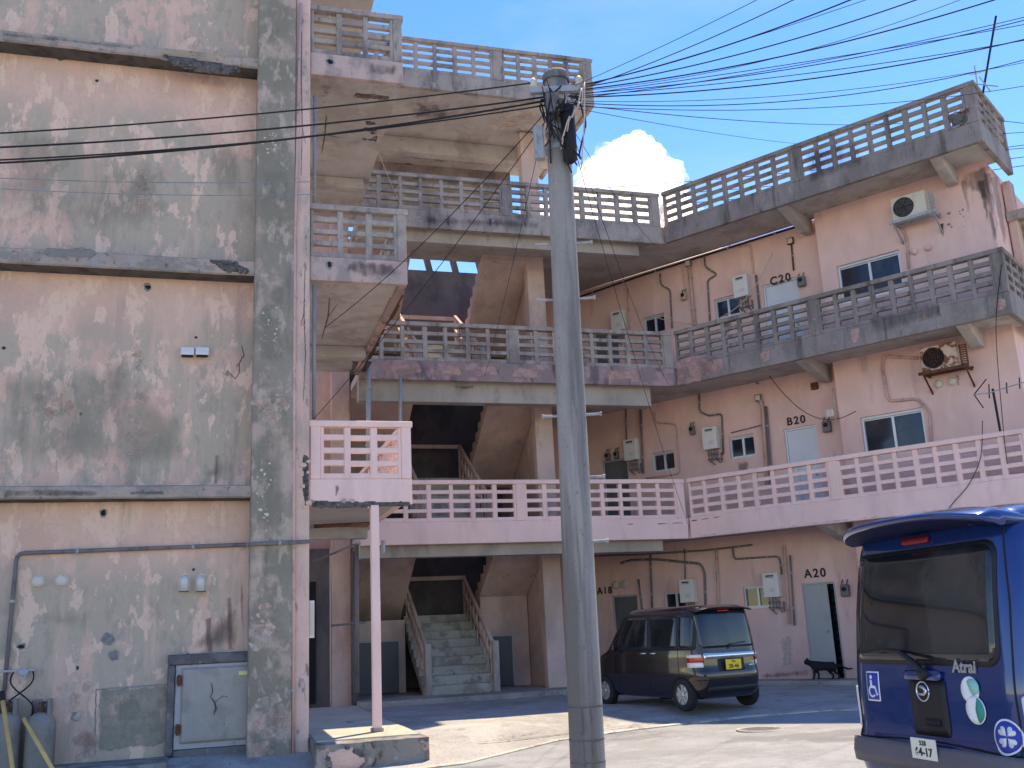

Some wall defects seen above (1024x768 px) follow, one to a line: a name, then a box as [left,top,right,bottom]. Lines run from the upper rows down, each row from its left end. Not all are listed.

spalling [163,54,241,75]
spalling [210,260,249,274]
spalling [299,455,410,509]
damp [207,614,231,651]
spalling [325,746,365,768]